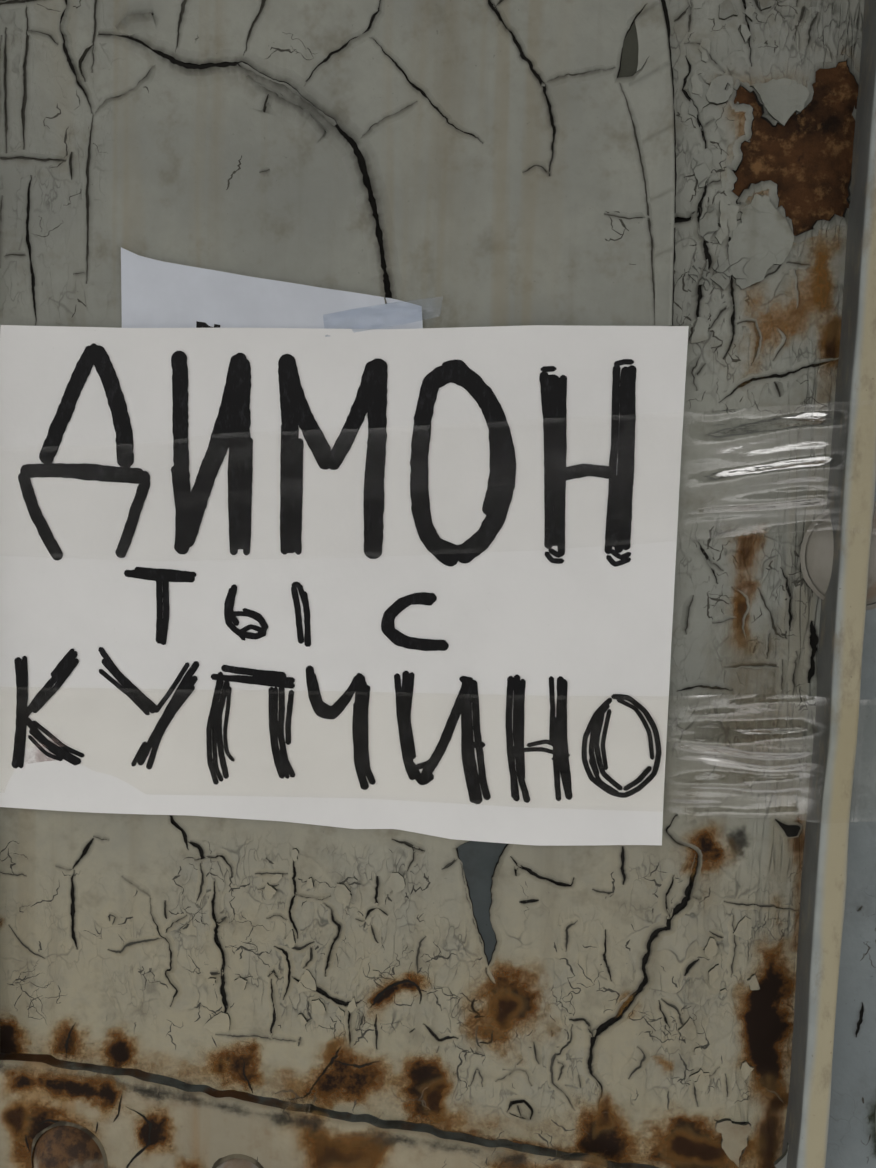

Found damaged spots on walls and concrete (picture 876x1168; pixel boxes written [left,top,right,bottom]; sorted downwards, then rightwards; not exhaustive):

peeling [613,3,649,83]
crack [0,0,485,326]
crack [481,0,844,416]
rust [725,53,860,366]
rust [3,1031,137,1168]
rust [179,1043,261,1091]
rust [280,1039,495,1168]
crack [0,812,800,1168]
peeling [452,840,514,968]
rust [466,965,541,1052]
rust [493,935,798,1168]
crack [856,905,876,968]